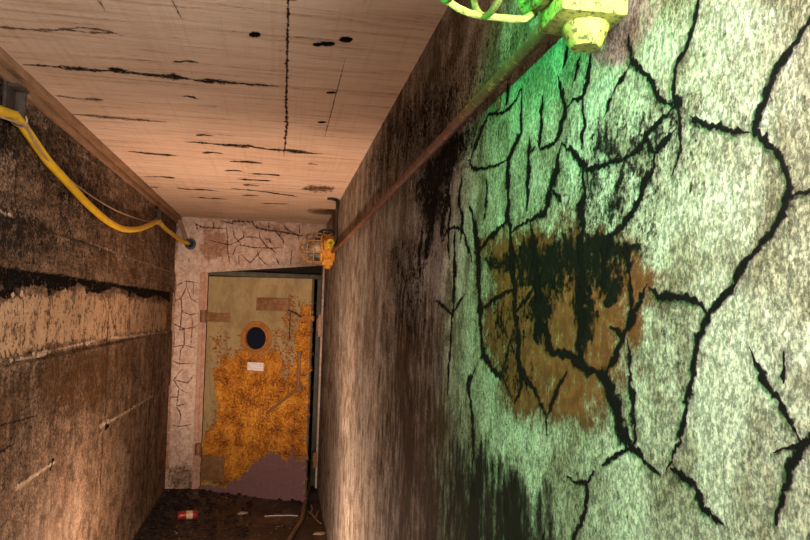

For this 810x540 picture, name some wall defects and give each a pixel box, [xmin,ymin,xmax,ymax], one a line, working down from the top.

crack [0,26,123,36]
crack [22,0,318,204]
water stain [367,45,492,199]
peeling [0,286,167,363]
crack [146,259,198,502]
crack [193,220,304,266]
rust [198,294,315,488]
water stain [377,117,562,540]
water stain [472,92,698,431]
crack [418,0,810,540]